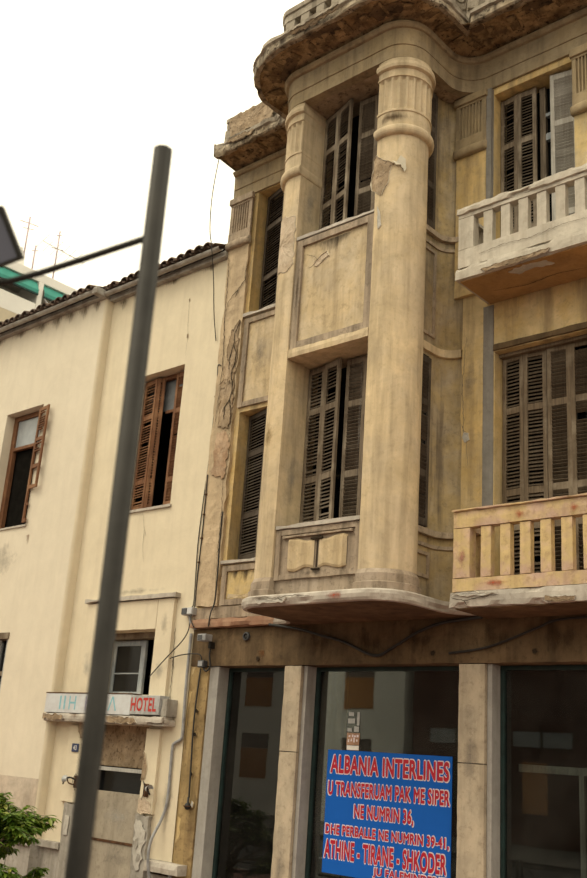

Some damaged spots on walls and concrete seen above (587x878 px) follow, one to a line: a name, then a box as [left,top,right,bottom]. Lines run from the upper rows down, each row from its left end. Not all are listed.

peeling [370,155,407,195]
crack [215,258,247,434]
peeling [132,797,151,871]